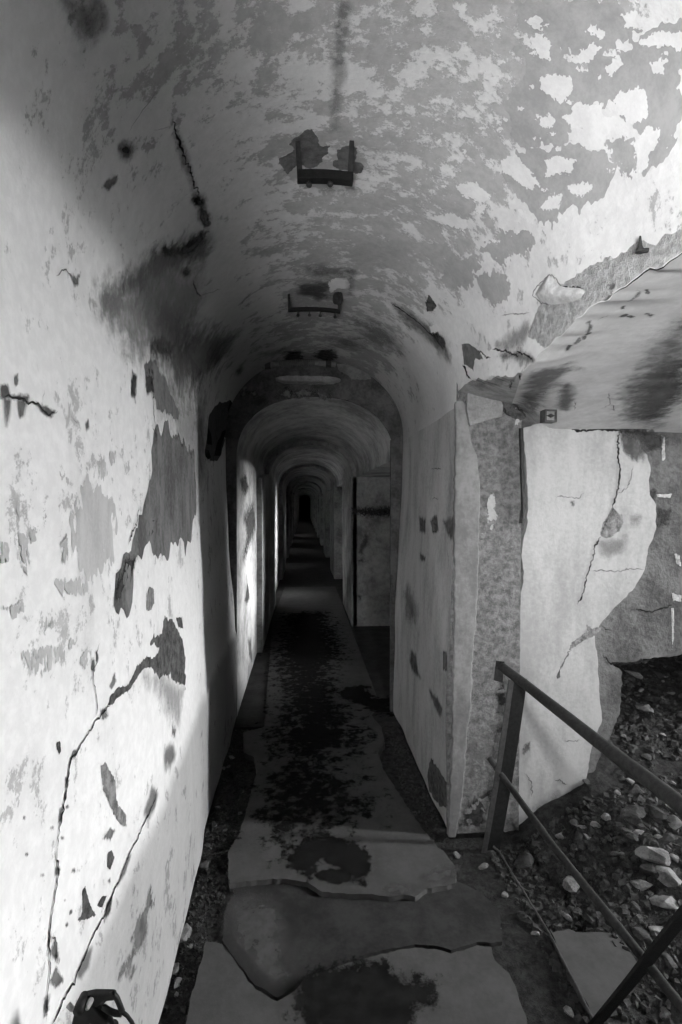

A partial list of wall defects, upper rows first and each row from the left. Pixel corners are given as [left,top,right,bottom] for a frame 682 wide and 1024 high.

crack [131,89,210,227]
spalling [278,129,364,174]
peeling [430,0,682,308]
leakage [106,231,234,391]
spalling [54,358,232,618]
spalling [108,617,186,766]
peeling [427,401,498,837]
crack [572,394,633,506]
crack [578,539,644,602]
spalling [600,507,623,538]
crack [44,650,158,1023]
spalling [101,762,127,882]